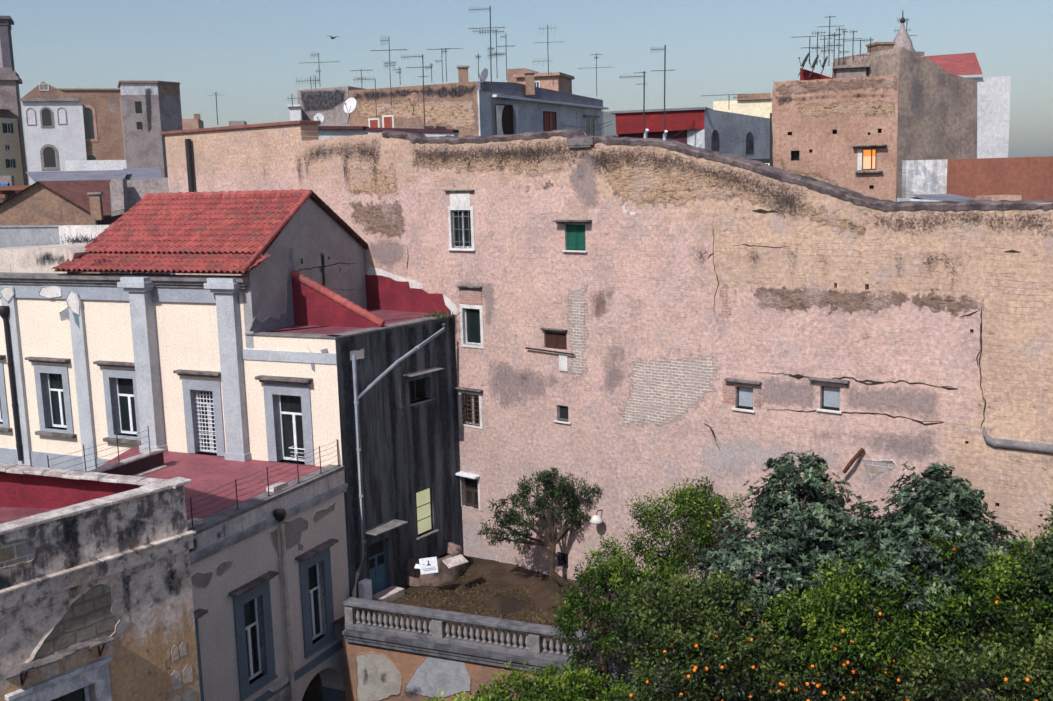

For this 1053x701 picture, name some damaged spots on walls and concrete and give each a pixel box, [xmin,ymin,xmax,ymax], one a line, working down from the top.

flaking render [567,284,589,379]
crack [763,308,986,427]
leakage [64,516,79,569]
leakage [0,576,12,590]
leakage [166,570,180,594]
flaking render [191,560,234,589]
flaking render [24,579,122,663]